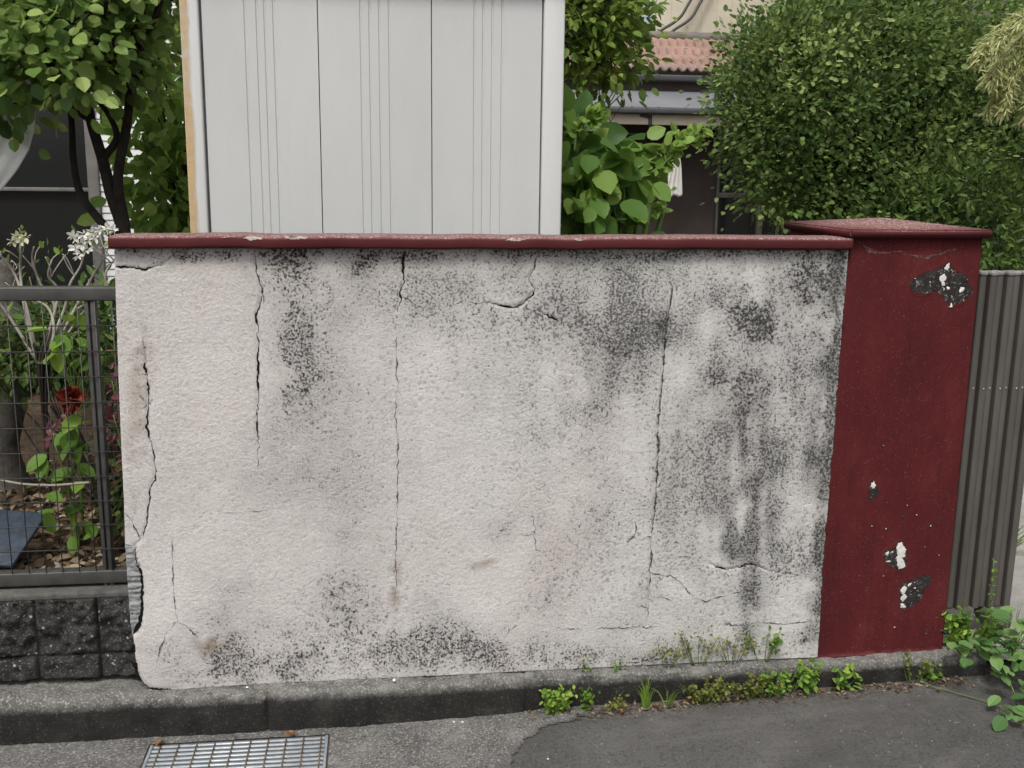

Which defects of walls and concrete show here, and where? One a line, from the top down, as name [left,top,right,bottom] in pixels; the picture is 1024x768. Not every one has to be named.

crack [127,337,157,634]
crack [132,545,198,690]
crack [254,251,264,466]
crack [393,253,421,604]
damp [115,248,848,687]
crack [456,257,577,330]
crack [559,266,800,630]
peeling [867,481,888,503]
peeling [882,541,931,611]
peeling [909,263,973,308]